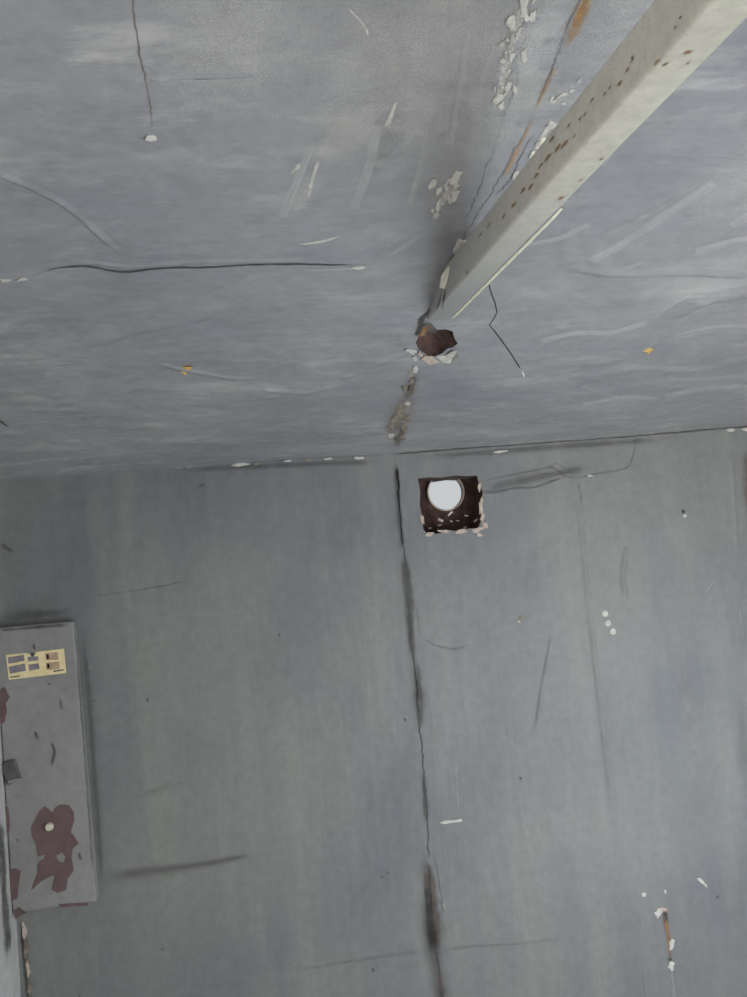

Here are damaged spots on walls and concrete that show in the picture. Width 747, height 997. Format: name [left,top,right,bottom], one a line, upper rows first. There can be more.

crack [132,1,157,142]
peeling [484,0,544,110]
peeling [528,79,580,161]
rust [563,0,592,49]
crack [0,257,368,282]
crack [175,426,747,997]